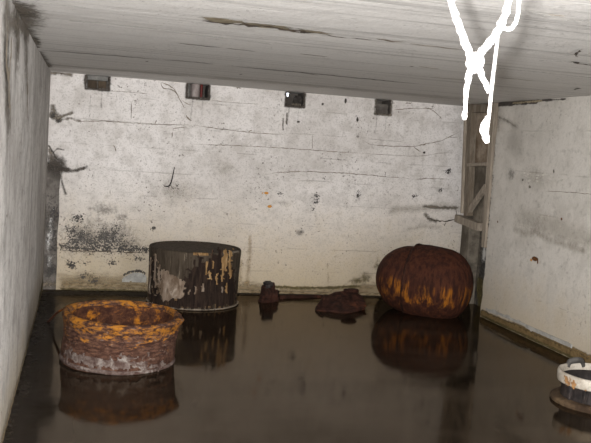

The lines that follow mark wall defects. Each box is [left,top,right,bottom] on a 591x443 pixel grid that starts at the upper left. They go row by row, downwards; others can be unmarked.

crack [203,17,396,42]
damp [4,1,72,133]
crack [74,82,457,156]
crack [266,171,408,179]
damp [424,205,458,222]
damp [237,284,261,293]
damp [275,275,381,296]
damp [1,195,149,443]